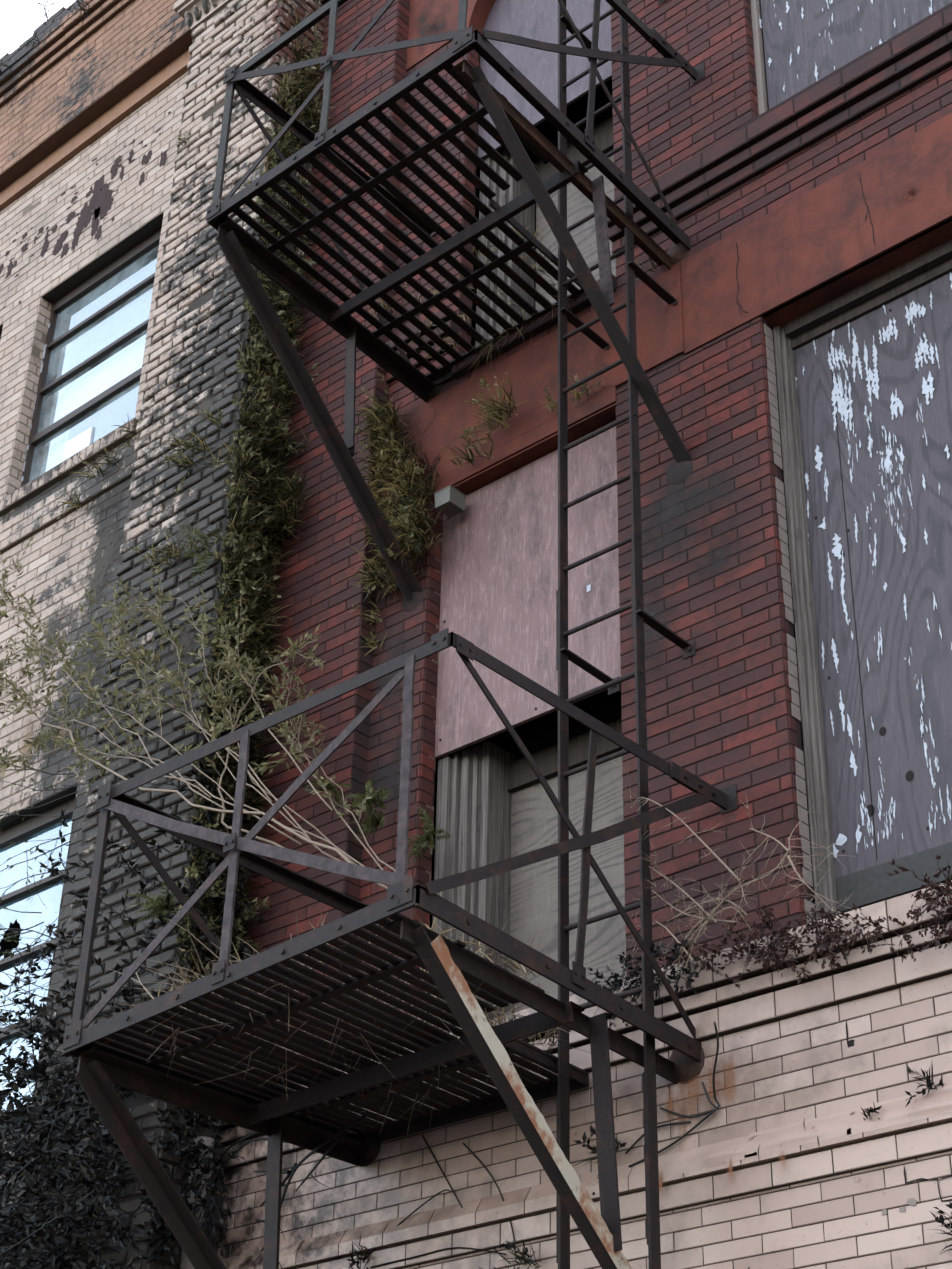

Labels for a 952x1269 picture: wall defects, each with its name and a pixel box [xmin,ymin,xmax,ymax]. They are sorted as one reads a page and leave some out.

peeling [0,127,167,278]
peeling [805,291,941,639]
peeling [822,638,839,673]
peeling [867,627,883,672]
peeling [830,690,874,776]
peeling [905,647,951,835]
peeling [833,757,903,858]